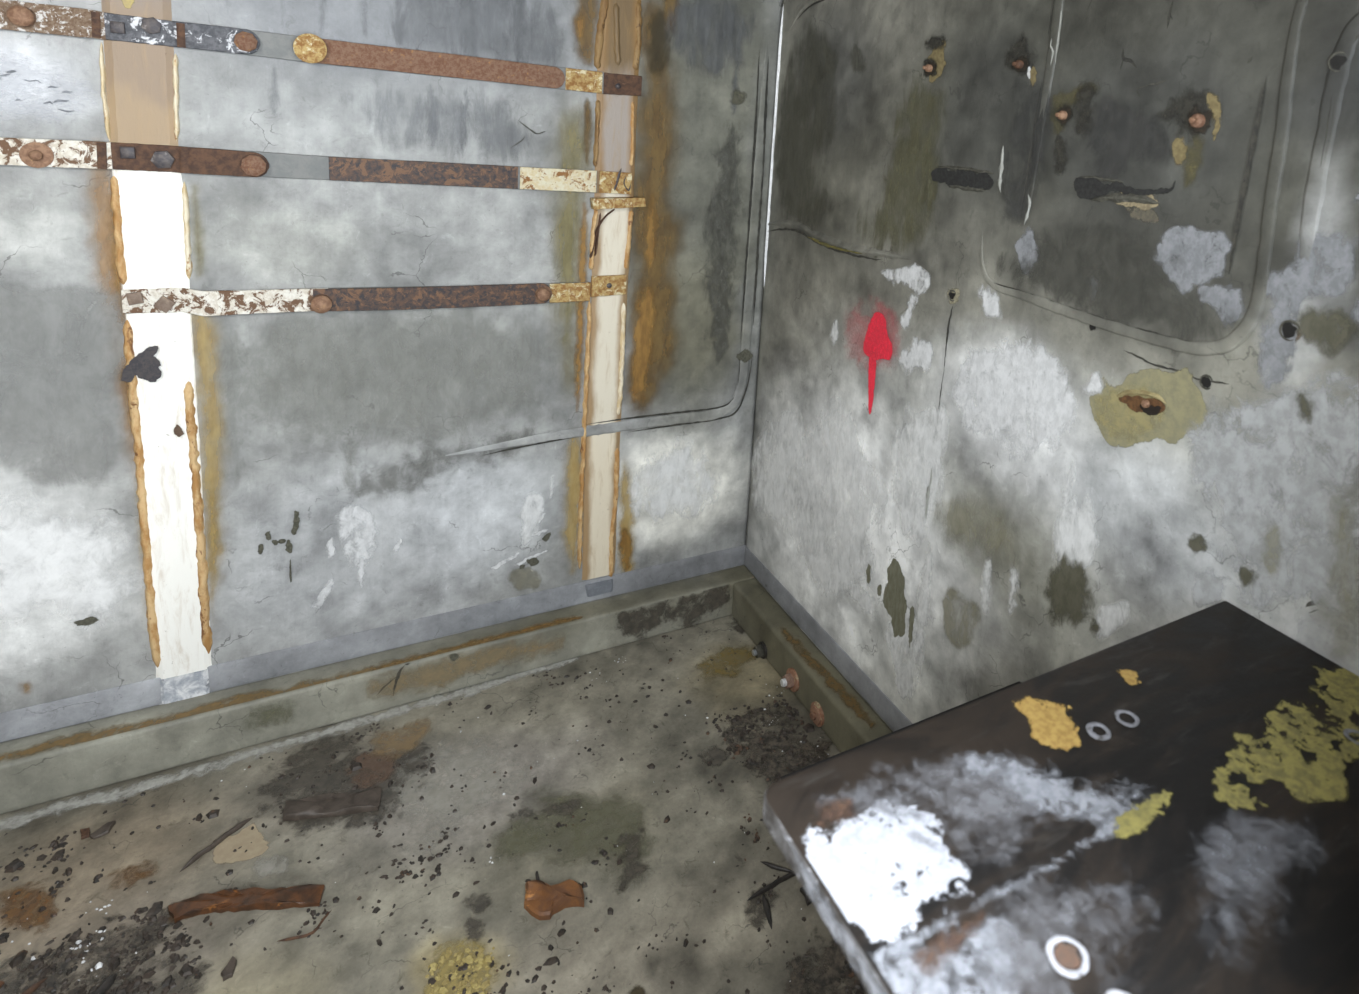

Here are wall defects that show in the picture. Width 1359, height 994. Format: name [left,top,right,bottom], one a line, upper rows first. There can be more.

corrosion [91,11,101,38]
corrosion [176,23,186,48]
corrosion [574,0,597,64]
corrosion [179,147,189,173]
corrosion [561,102,591,170]
corrosion [93,142,125,326]
corrosion [556,192,586,283]
corrosion [629,0,679,408]
corrosion [561,301,584,396]
corrosion [196,315,223,572]
spalling [1140,405,1161,415]